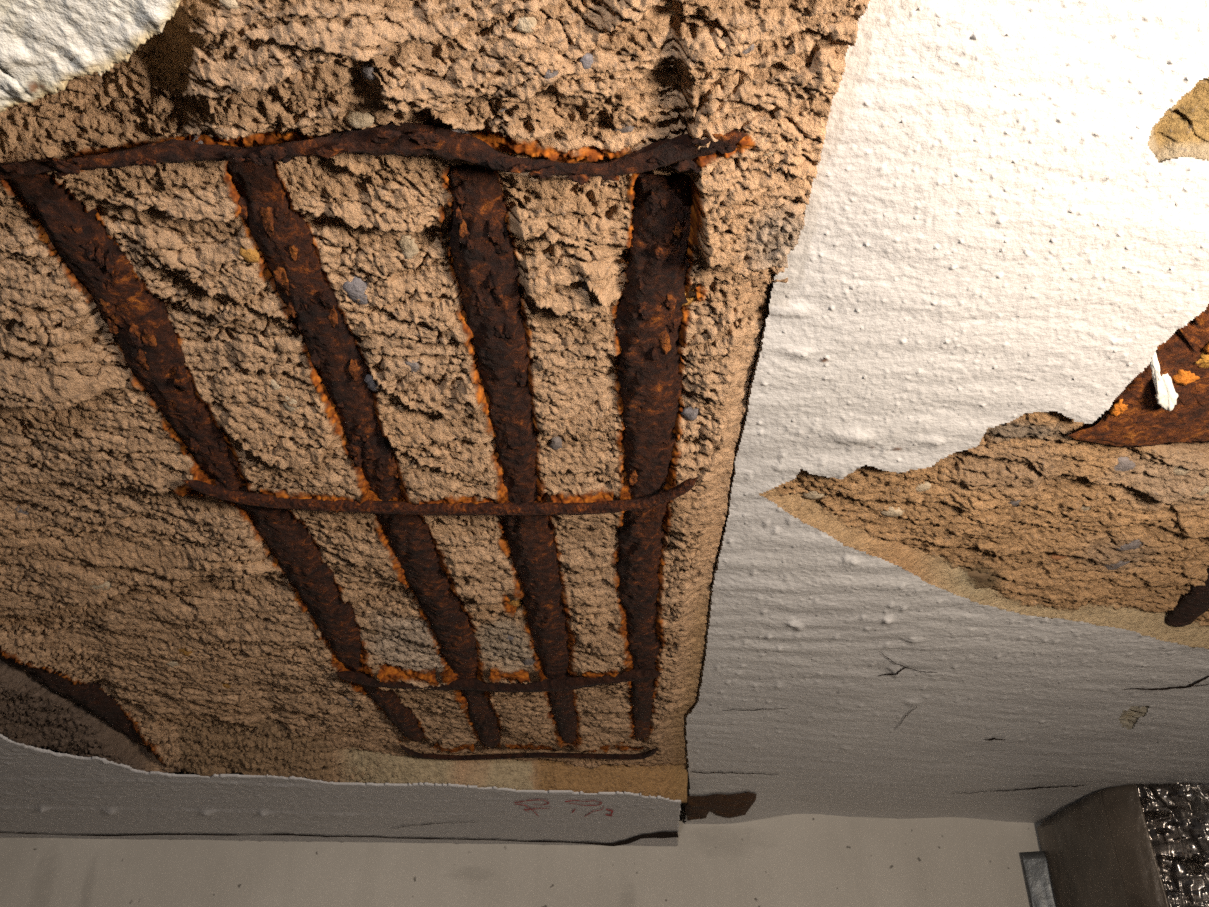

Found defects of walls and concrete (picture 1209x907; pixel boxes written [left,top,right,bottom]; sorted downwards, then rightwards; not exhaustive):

spalling [1148,77,1209,163]
rust [0,131,755,753]
spalling [0,0,870,803]
rust [1109,399,1128,417]
peeling [1150,353,1178,411]
rust [1172,343,1209,386]
spalling [759,411,1209,649]